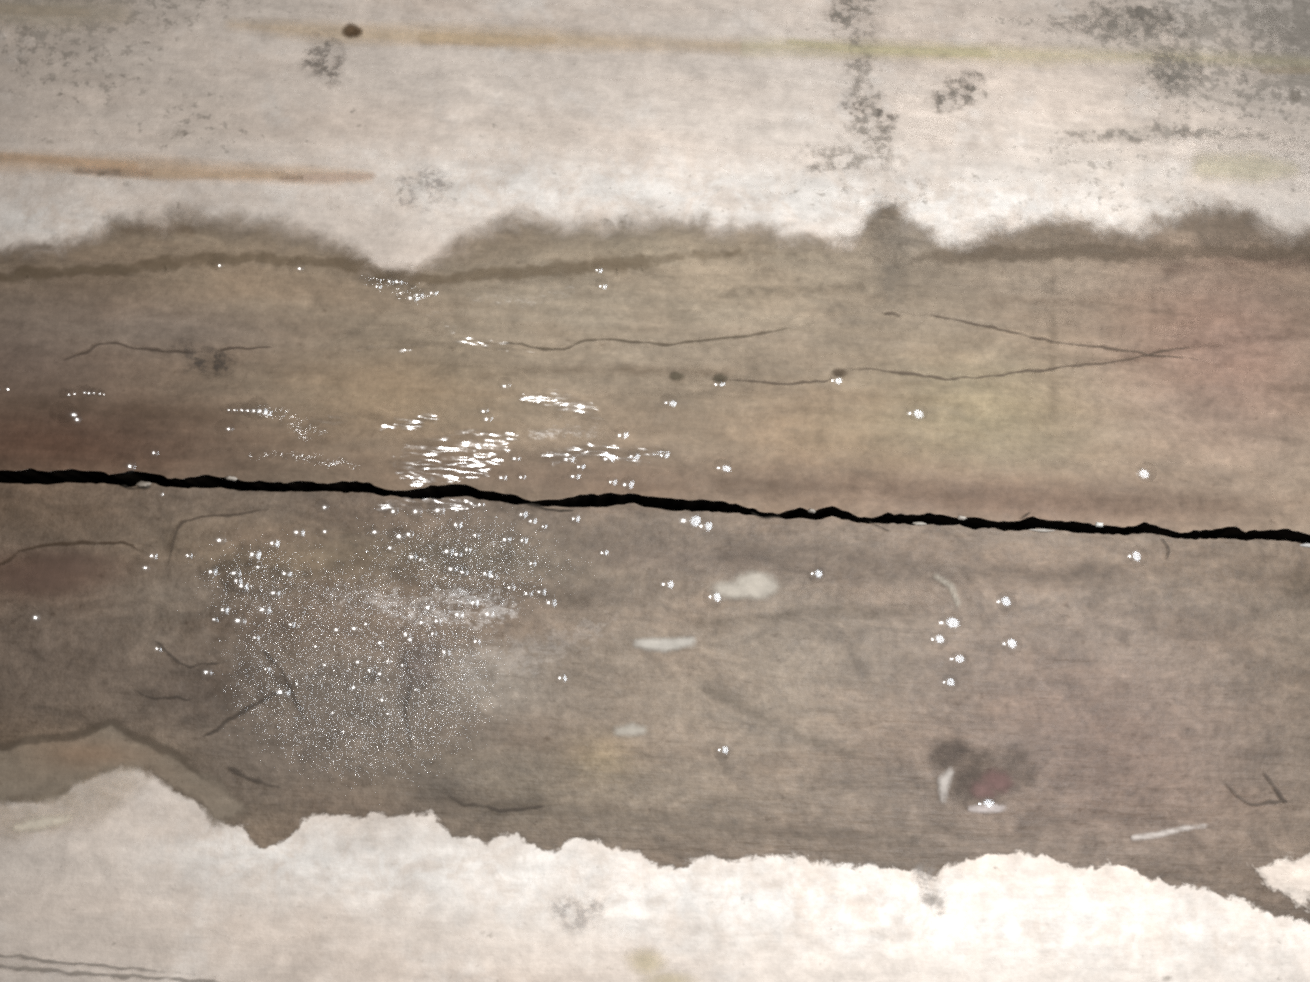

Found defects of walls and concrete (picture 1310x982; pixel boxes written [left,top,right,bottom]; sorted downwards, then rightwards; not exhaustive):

water stain [1097,8,1176,35]
water stain [834,0,894,151]
crack [0,541,135,565]
crack [0,468,1310,556]
water stain [0,205,1310,924]